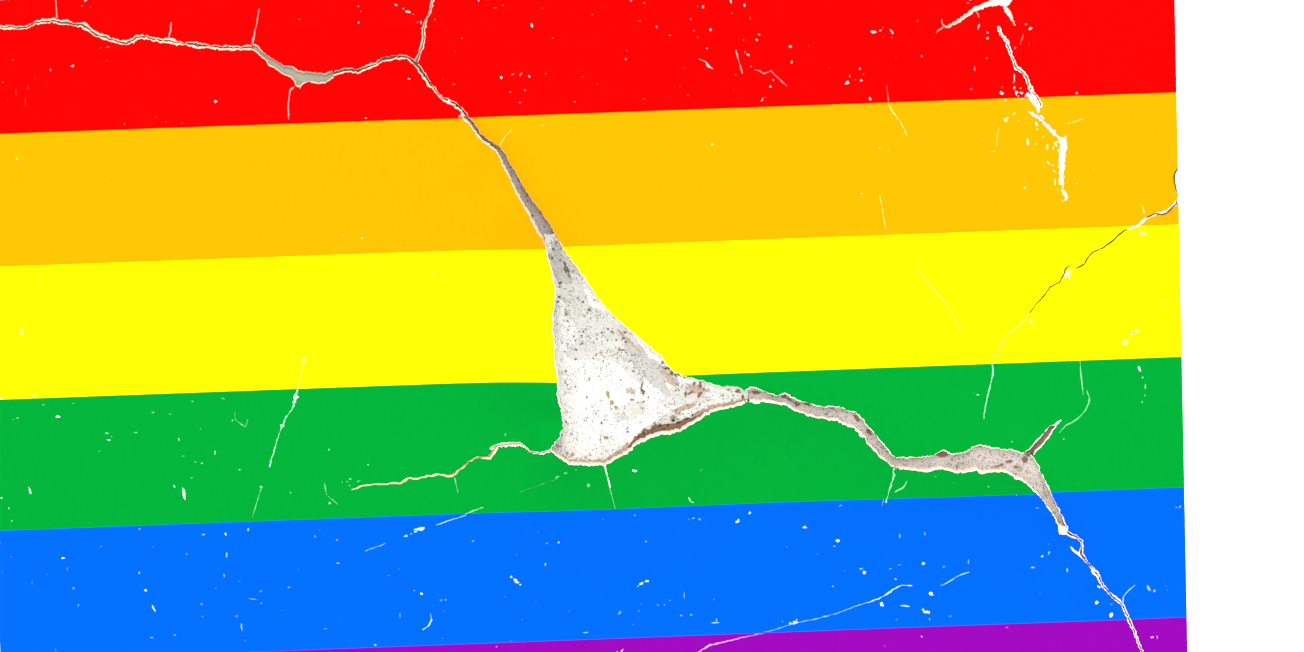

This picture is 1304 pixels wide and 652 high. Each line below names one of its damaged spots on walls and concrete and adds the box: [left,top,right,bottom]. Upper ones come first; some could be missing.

crack [0,0,259,51]
crack [333,0,558,244]
crack [975,11,1062,140]
crack [984,168,1179,413]
spalling [544,233,767,466]
crack [269,355,307,467]
crack [351,442,550,492]
crack [604,465,616,509]
crack [745,387,897,504]
crack [1025,365,1090,454]
crack [1066,531,1144,652]